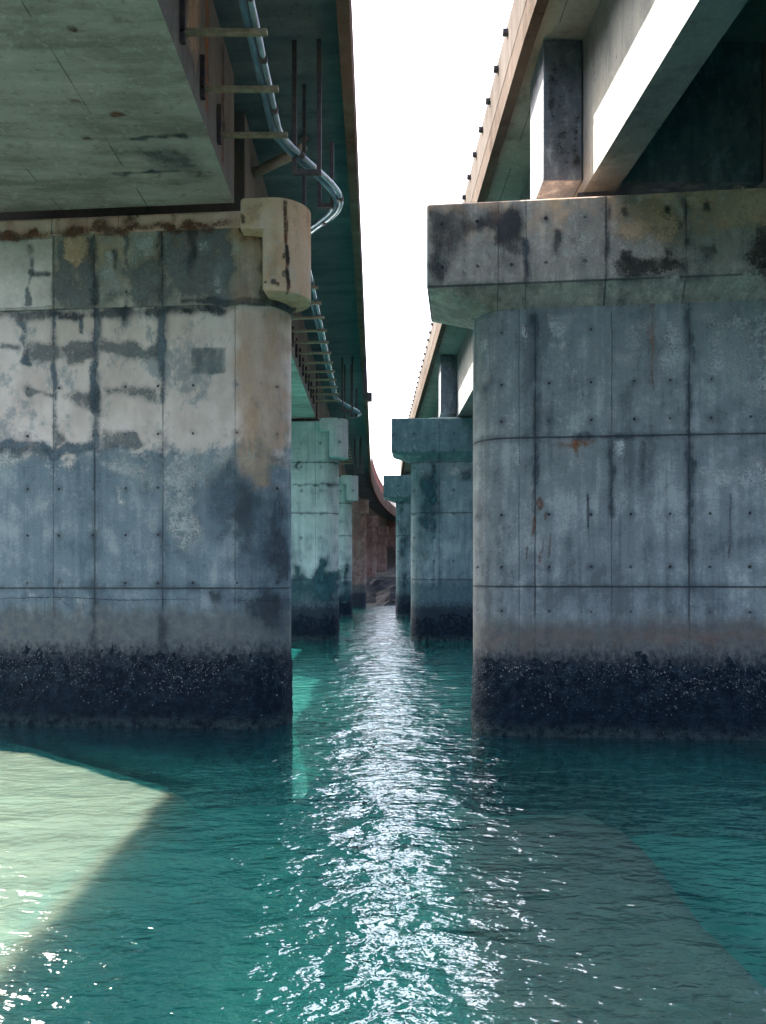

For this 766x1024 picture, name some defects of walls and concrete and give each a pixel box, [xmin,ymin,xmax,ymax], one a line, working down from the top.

corrosion [0,215,227,242]
water stain [429,211,466,279]
water stain [478,199,687,292]
water stain [0,228,350,628]